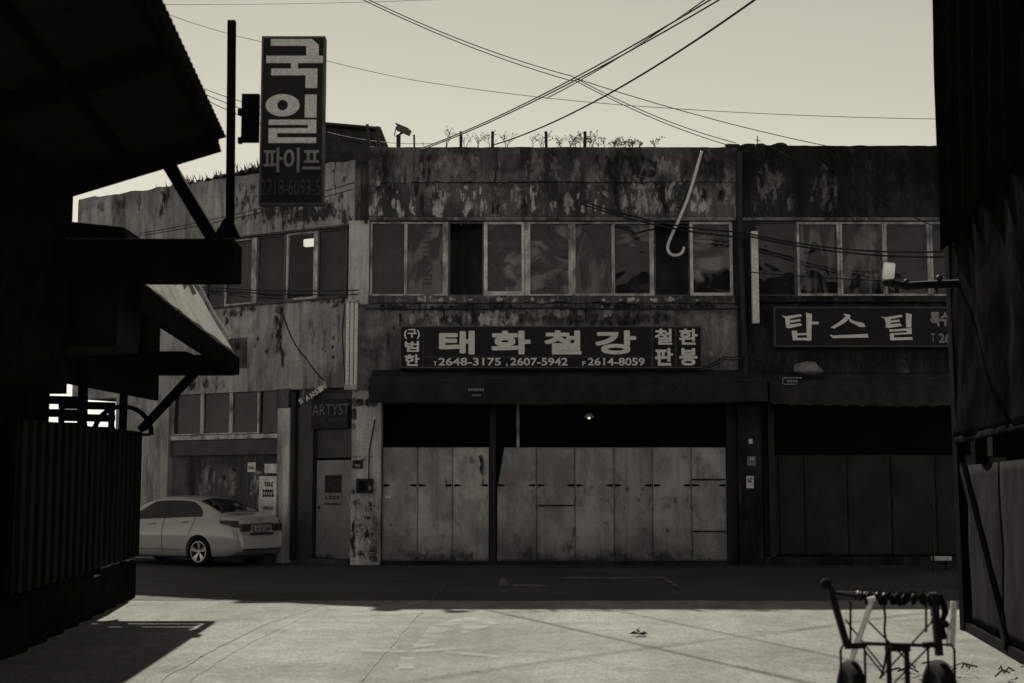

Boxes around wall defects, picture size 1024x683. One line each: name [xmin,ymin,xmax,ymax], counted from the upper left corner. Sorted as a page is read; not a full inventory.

peeling [432,192,447,217]
peeling [460,185,536,217]
peeling [550,192,605,215]
leakage [596,154,666,208]
leakage [274,307,284,366]
spalling [350,490,381,562]